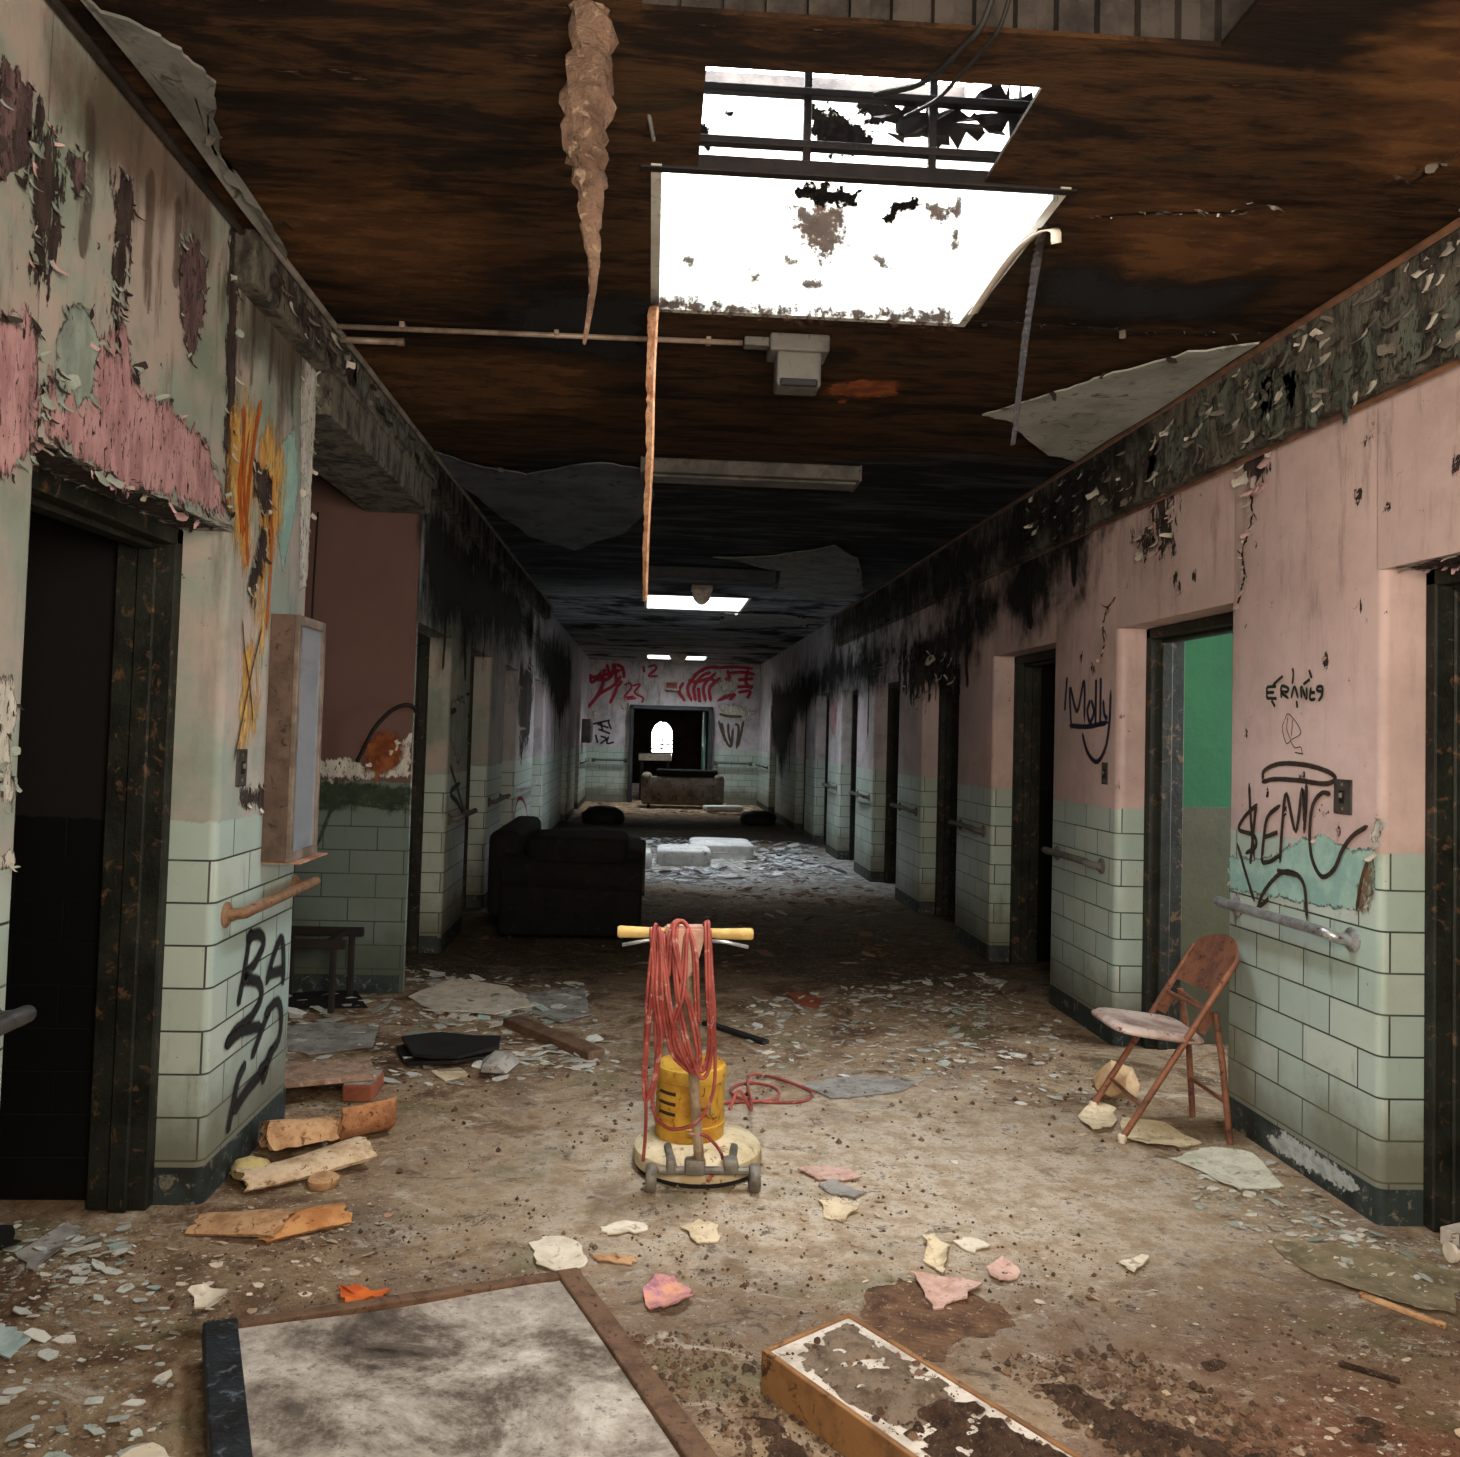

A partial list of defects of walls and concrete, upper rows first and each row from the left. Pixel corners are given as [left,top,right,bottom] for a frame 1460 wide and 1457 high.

peeling [0,0,655,610]
peeling [982,233,1460,597]
peeling [0,675,24,814]
peeling [1227,818,1386,915]